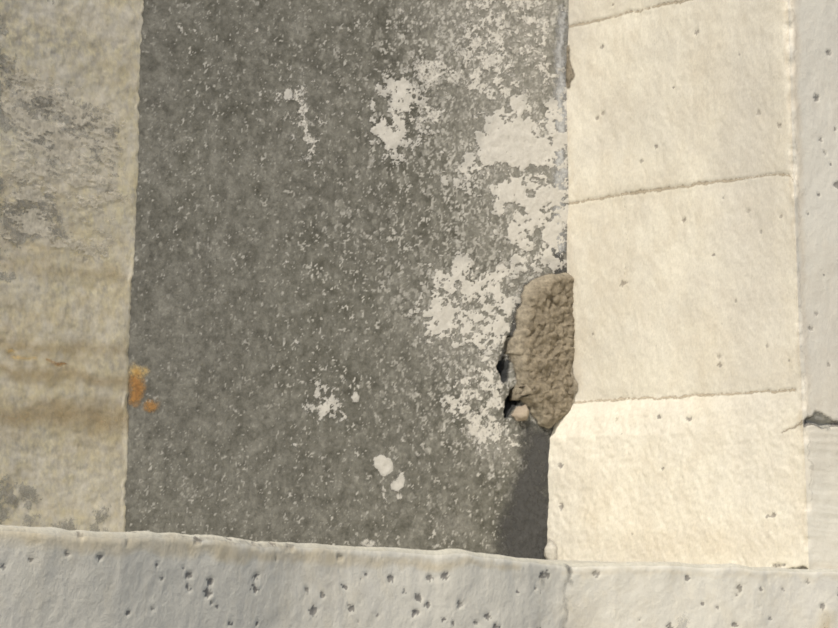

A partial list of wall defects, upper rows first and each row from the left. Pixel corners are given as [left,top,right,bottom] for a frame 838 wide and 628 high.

crack [569,0,688,28]
peeling [274,80,327,179]
crack [568,173,790,204]
peeling [362,0,578,465]
corrosion [129,367,157,411]
peeling [302,380,347,424]
crack [574,388,796,403]
crack [782,412,838,433]